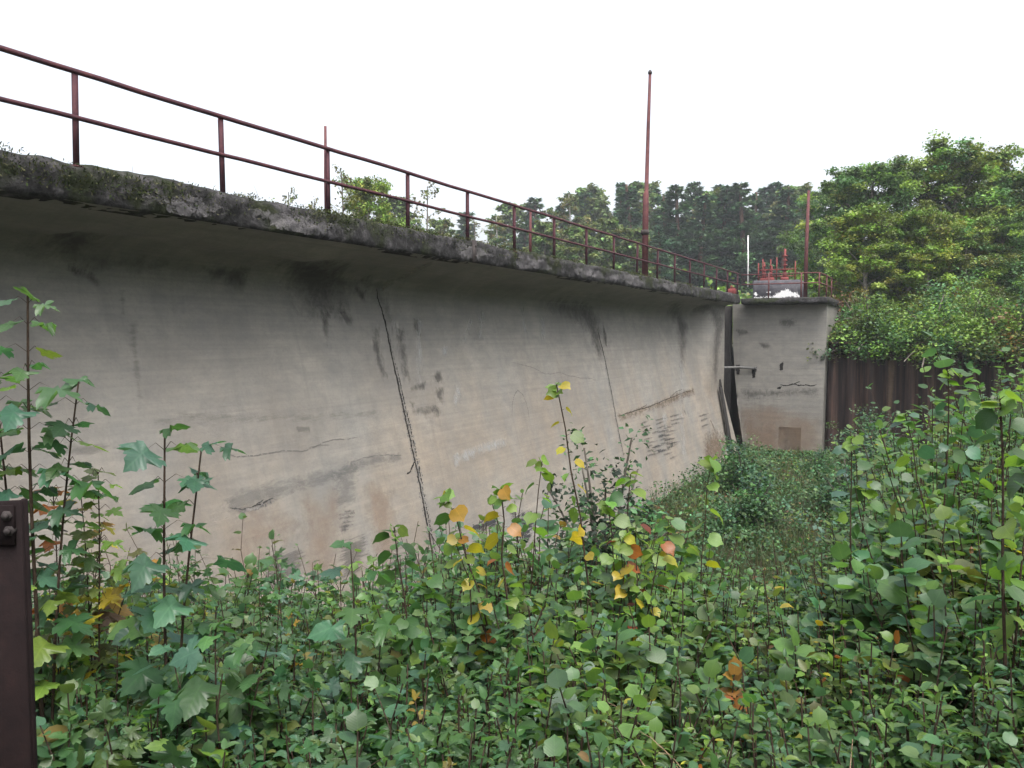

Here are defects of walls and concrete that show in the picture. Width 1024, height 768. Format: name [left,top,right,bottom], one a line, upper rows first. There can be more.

crack [231,289,438,557]
crack [513,333,690,455]